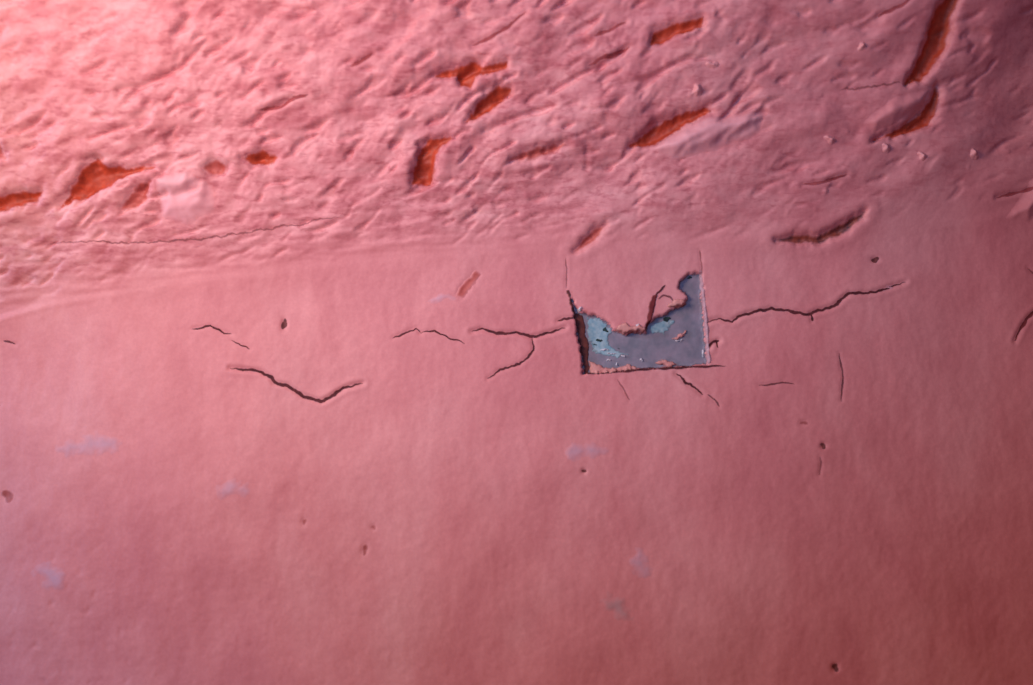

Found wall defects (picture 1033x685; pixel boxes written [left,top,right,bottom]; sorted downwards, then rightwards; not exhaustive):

spalling [650,16,703,46]
spalling [904,0,959,86]
spalling [434,61,511,122]
spalling [628,107,711,149]
spalling [60,157,156,211]
spalling [411,136,454,186]
spalling [774,211,865,245]
crack [195,325,362,403]
crack [393,317,573,378]
spalling [566,271,721,374]
crack [709,282,903,348]
crack [1015,311,1033,341]